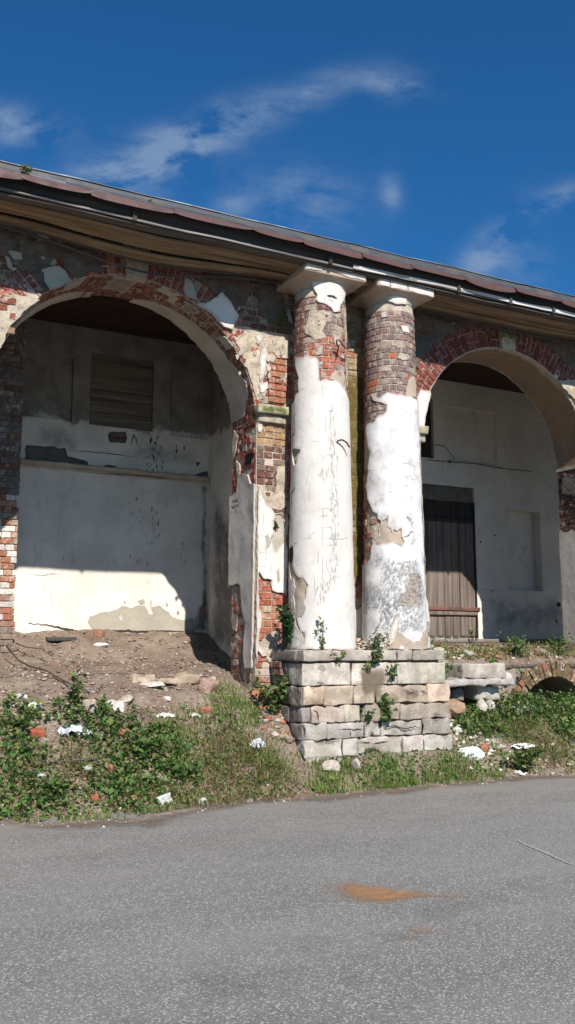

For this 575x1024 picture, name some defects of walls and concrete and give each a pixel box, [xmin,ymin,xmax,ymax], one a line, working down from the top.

peeling [0,213,121,348]
spalling [150,250,365,404]
spalling [25,445,88,465]
spalling [363,278,492,611]
peeling [88,599,195,634]
peeling [228,421,308,690]
crack [313,710,422,744]